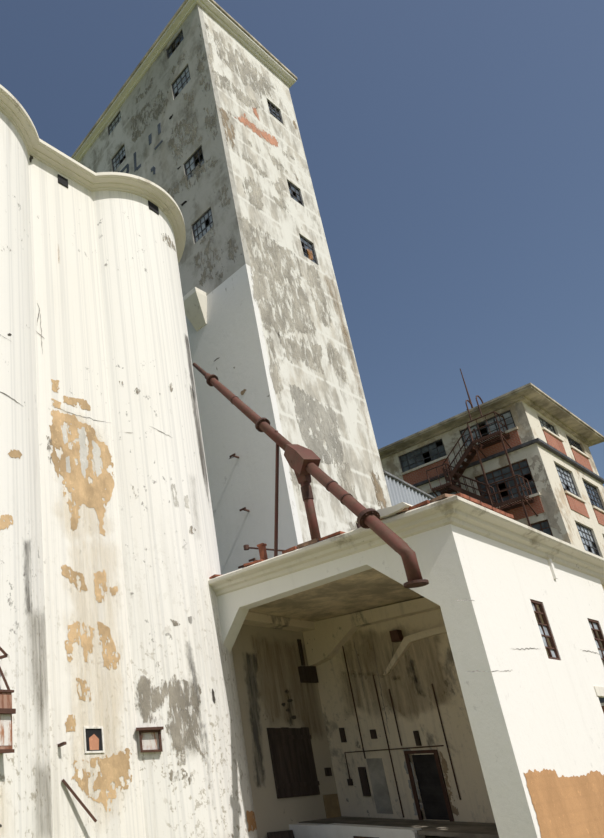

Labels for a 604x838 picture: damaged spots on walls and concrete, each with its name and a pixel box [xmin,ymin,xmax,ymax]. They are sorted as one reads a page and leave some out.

peeling [131,23,298,210]
peeling [46,379,114,536]
peeling [61,564,118,603]
peeling [65,621,120,670]
peeling [76,678,91,701]
peeling [65,714,76,732]
peeling [72,748,132,812]
peeling [524,769,604,838]